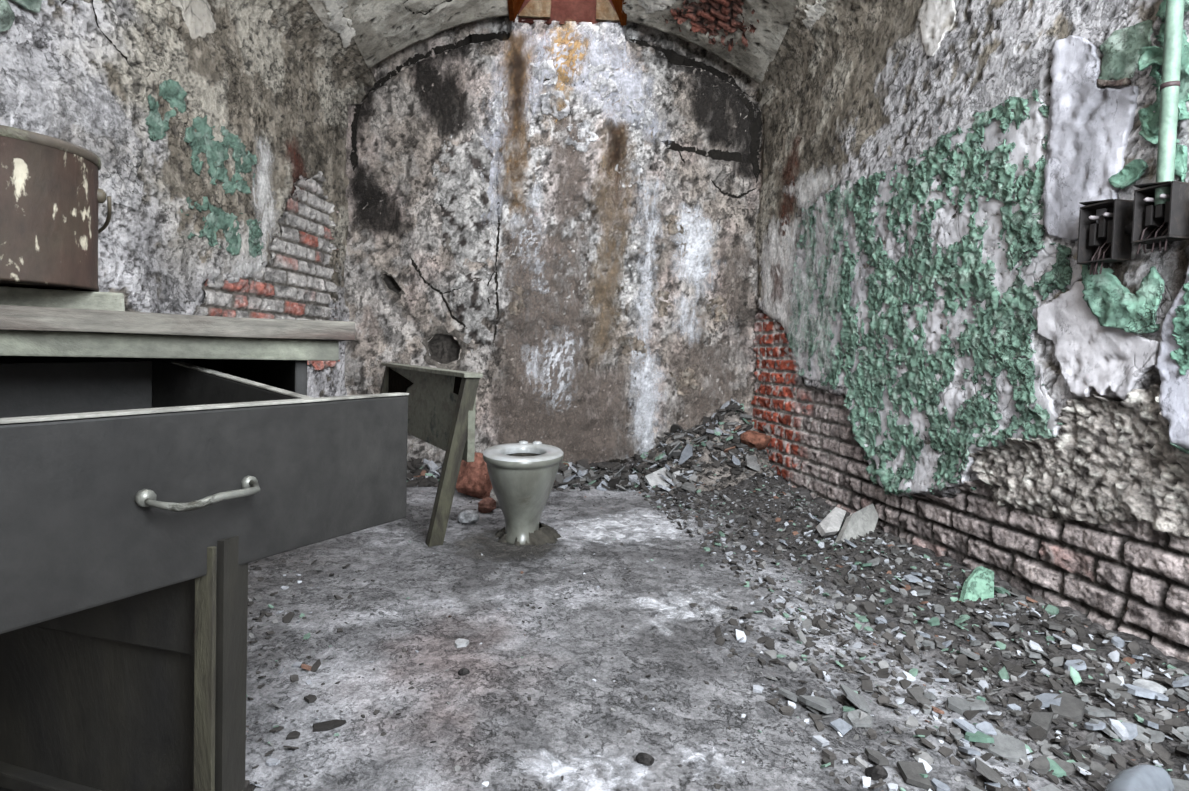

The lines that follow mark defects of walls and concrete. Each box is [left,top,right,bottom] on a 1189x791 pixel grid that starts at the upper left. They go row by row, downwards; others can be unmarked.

peeling [0,0,42,32]
flaking render [663,0,759,51]
water stain [351,74,381,136]
water stain [410,27,666,218]
water stain [652,45,759,178]
flaking render [145,79,339,321]
water stain [349,166,402,236]
water stain [789,168,837,216]
flaking render [307,360,340,371]
water stain [493,117,739,464]
water stain [677,206,836,365]
peeling [751,0,1189,662]